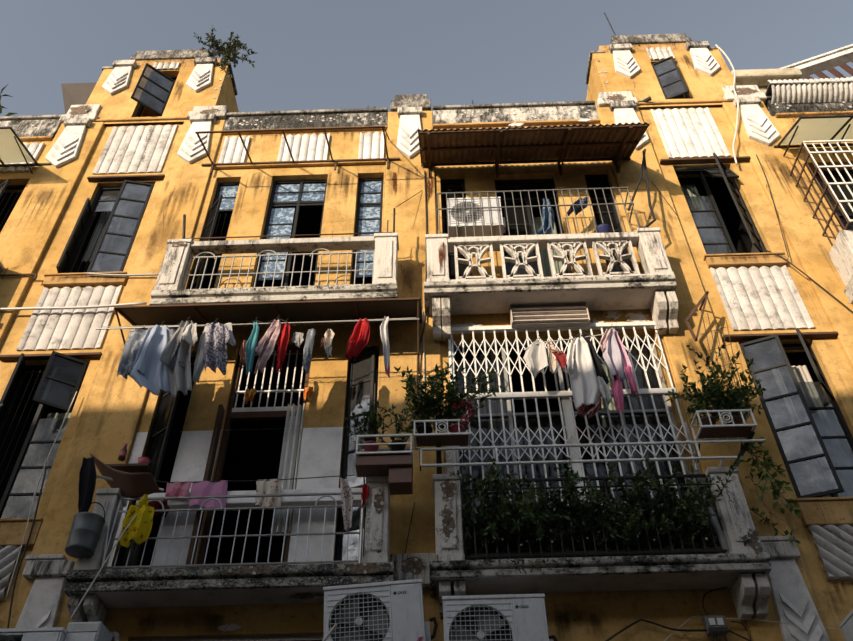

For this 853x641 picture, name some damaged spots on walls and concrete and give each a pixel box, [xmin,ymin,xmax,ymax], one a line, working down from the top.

spalling [373,489,384,514]
spalling [439,480,457,538]